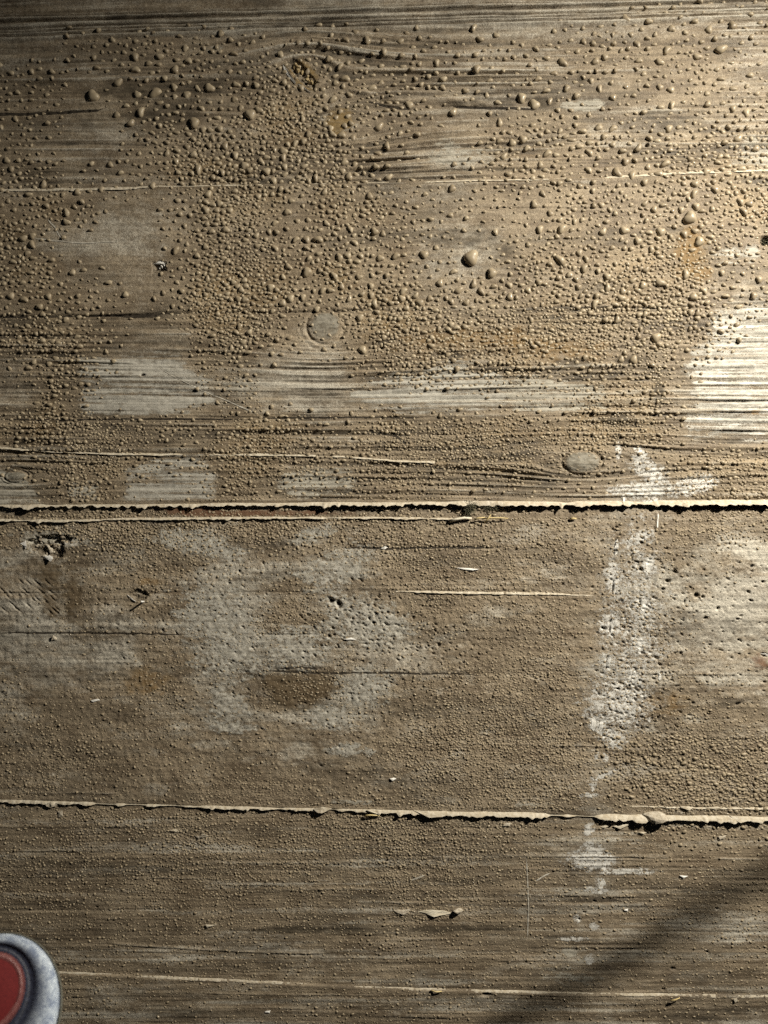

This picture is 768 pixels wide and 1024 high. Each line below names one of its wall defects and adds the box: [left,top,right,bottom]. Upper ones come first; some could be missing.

leakage [607,442,718,502]
leakage [575,514,672,798]
peeling [413,810,451,818]
spalling [601,811,670,834]
peeling [682,806,749,823]
leakage [567,823,655,894]